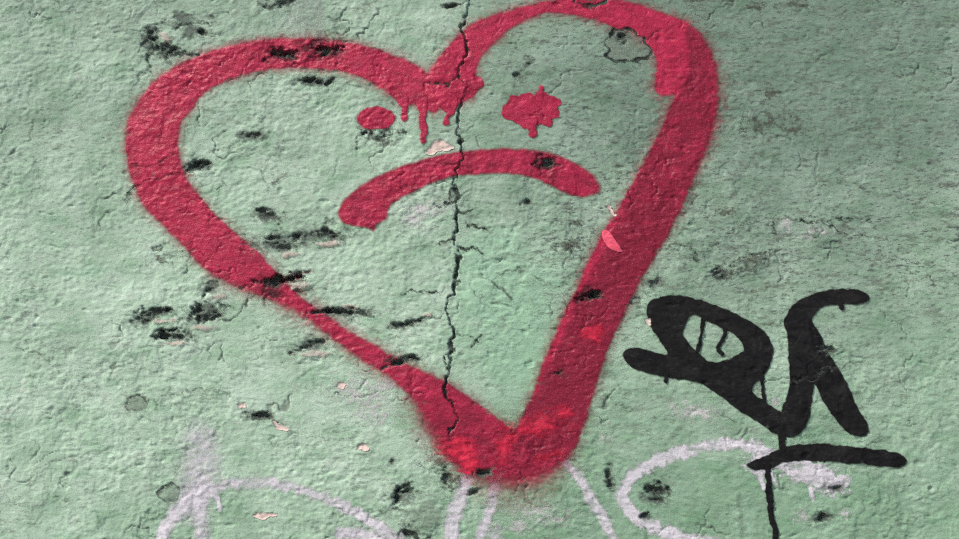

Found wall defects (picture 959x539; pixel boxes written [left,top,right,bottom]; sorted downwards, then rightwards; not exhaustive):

spalling [425,140,454,155]
crack [405,12,488,433]